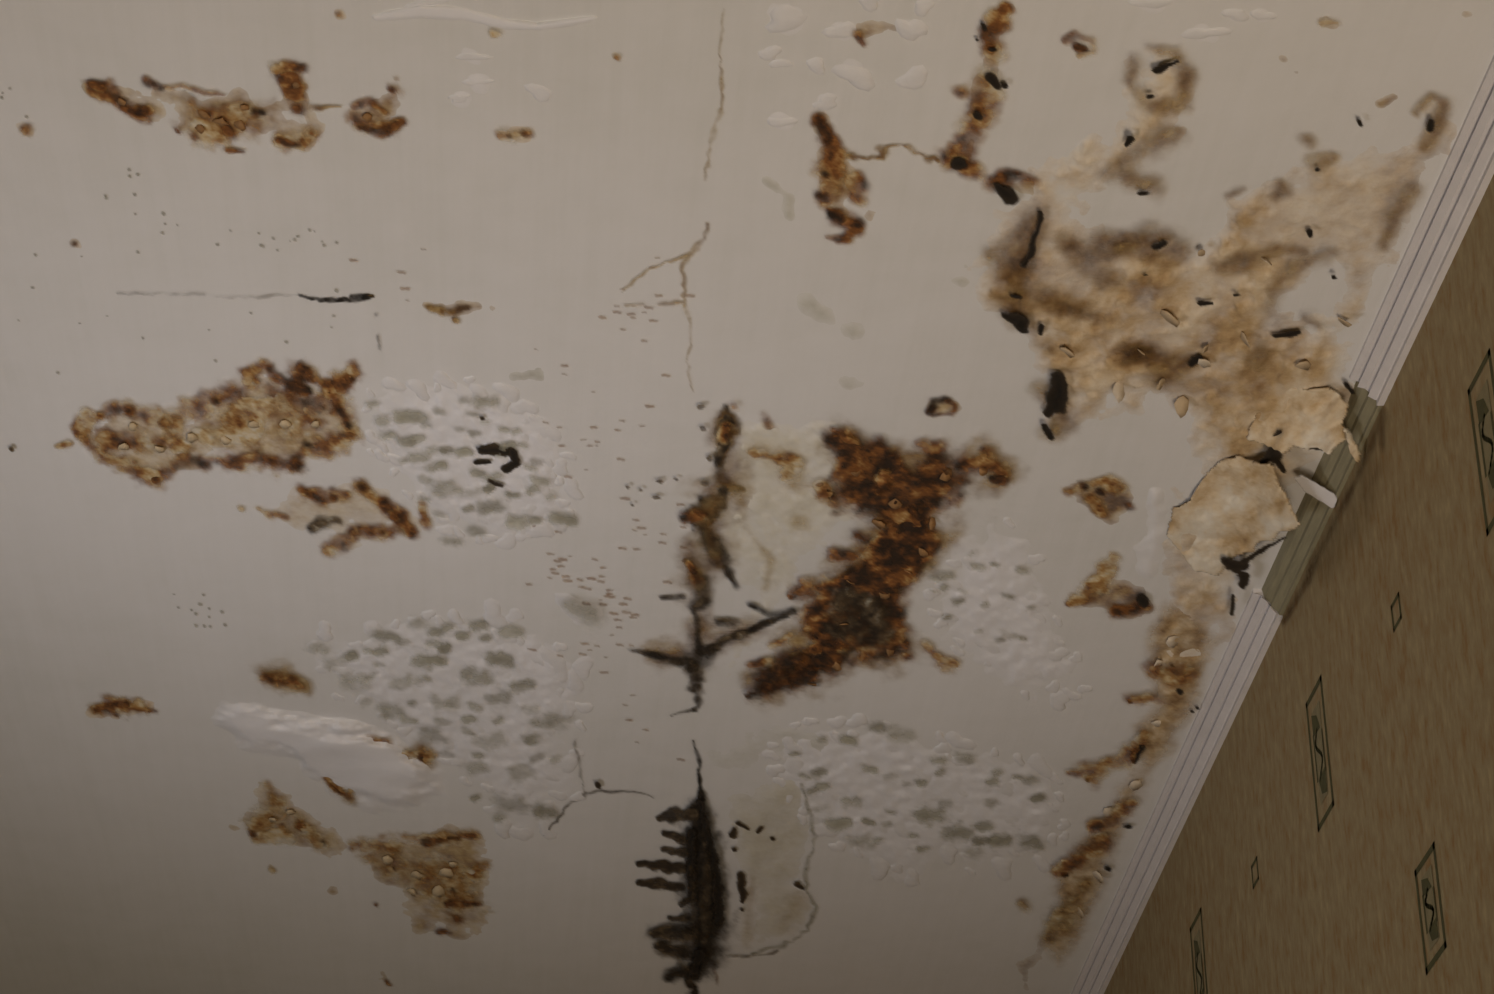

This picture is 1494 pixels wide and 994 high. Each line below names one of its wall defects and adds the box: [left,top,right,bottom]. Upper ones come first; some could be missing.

corrosion [81,61,407,154]
corrosion [811,2,1038,244]
flaking render [967,48,1457,491]
corrosion [53,360,431,557]
crack [632,560,767,792]
corrosion [744,428,1014,699]
water stain [635,807,699,922]